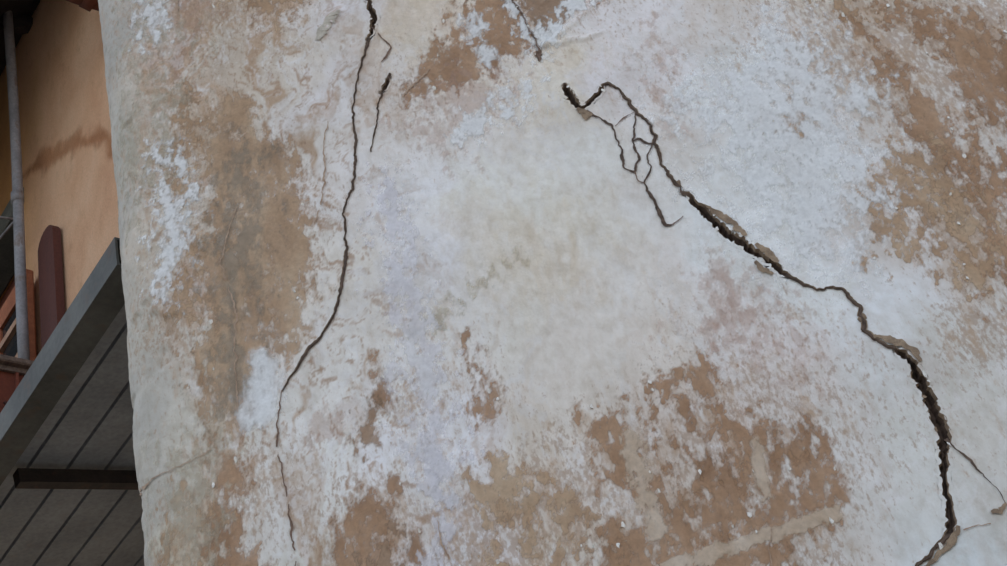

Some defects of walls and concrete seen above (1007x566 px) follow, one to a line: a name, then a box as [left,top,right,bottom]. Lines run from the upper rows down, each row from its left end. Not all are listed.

peeling [156,81,321,566]
crack [276,0,429,566]
peeling [402,0,569,108]
crack [511,0,543,61]
peeling [461,351,851,566]
crack [559,81,1007,566]
peeling [772,105,816,138]
peeling [809,0,1007,302]